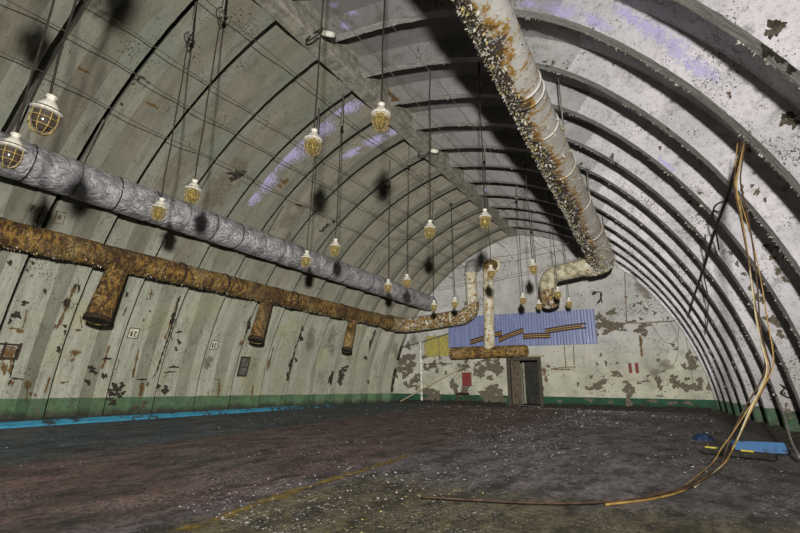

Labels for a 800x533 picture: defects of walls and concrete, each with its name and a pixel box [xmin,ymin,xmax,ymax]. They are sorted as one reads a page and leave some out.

spalling [730,19,800,89]
spalling [779,111,800,130]
corrosion [54,283,78,329]
corrosion [164,295,181,339]
peeling [84,365,126,406]
peeling [350,311,507,402]
peeling [577,329,736,406]